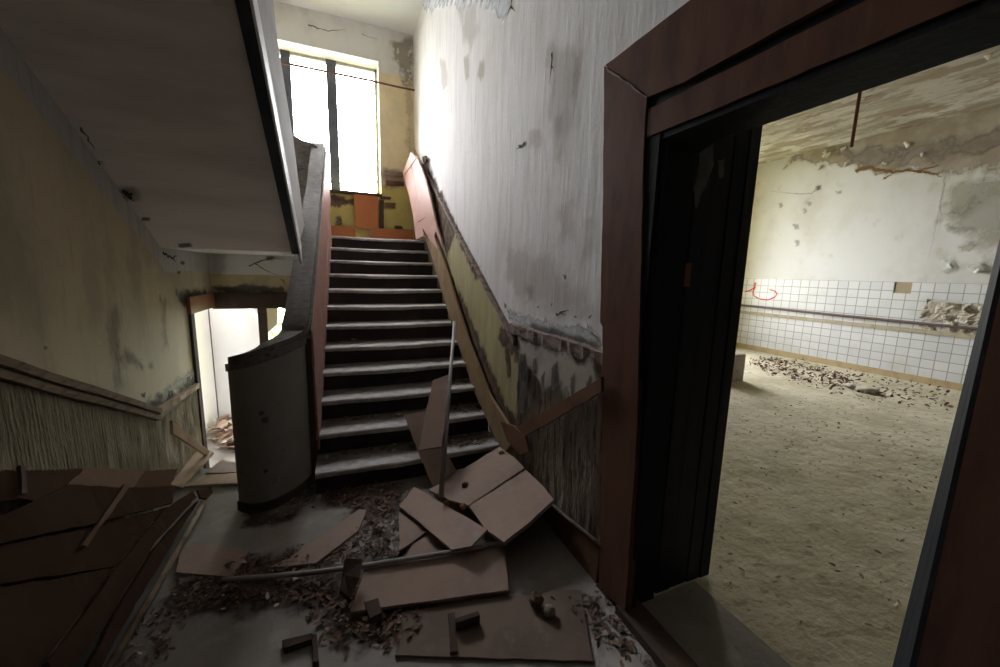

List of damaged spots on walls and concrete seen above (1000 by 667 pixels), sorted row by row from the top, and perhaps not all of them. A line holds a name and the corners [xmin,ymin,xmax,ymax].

peeling [393,39,412,85]
flaking render [782,105,1000,179]
water stain [427,169,558,426]
spalling [918,301,983,335]
water stain [141,377,194,407]